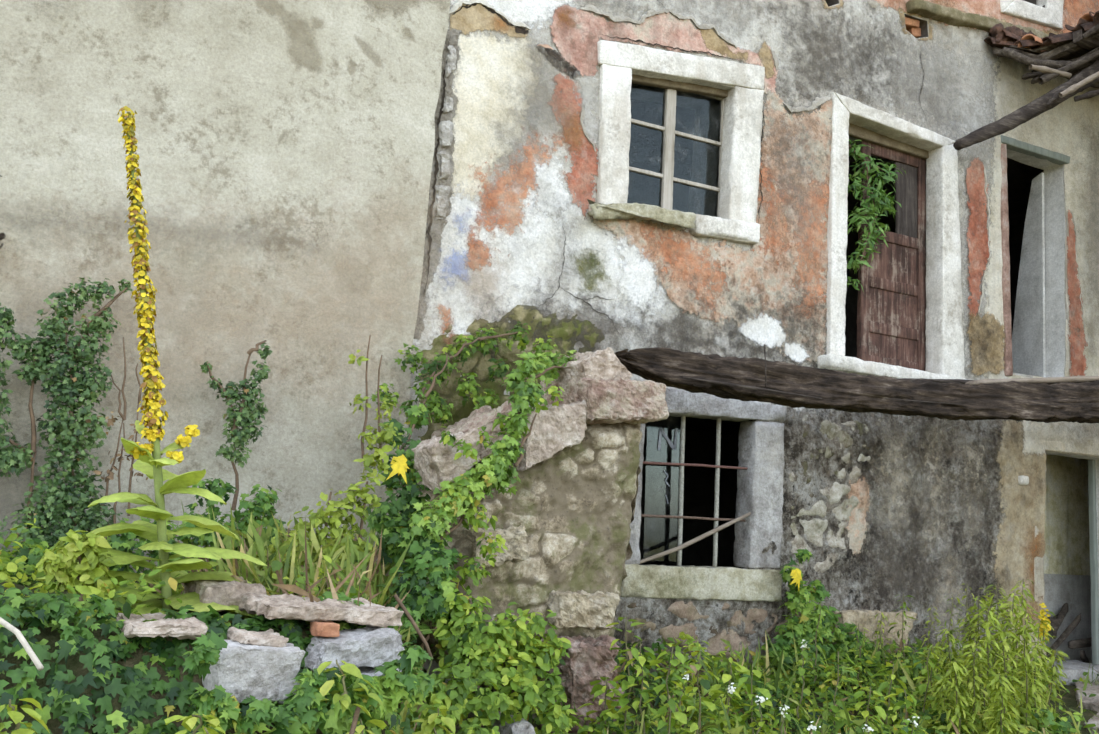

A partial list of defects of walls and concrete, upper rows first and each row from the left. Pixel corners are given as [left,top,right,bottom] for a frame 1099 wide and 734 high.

spalling [449,0,530,38]
flaking render [536,4,833,364]
flaking render [966,157,991,326]
flaking render [1067,210,1088,376]
spalling [614,403,1023,680]
water stain [858,421,989,639]